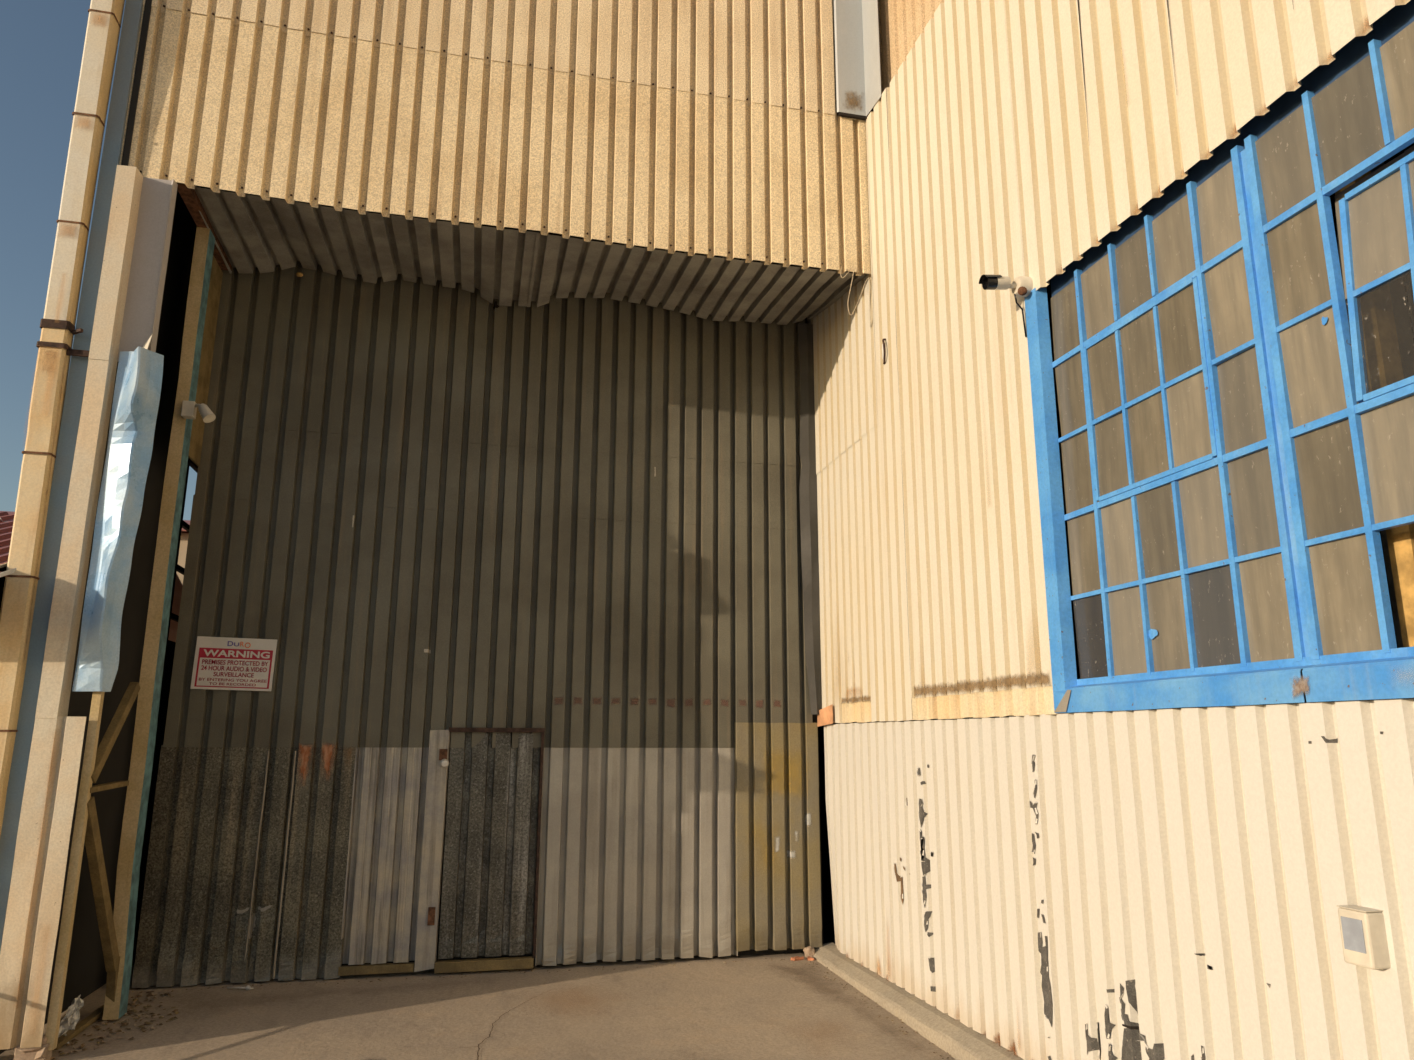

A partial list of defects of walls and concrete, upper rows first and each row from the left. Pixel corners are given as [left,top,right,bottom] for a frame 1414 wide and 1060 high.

damp [914,673,1049,696]
corrosion [299,744,334,779]
peeling [894,764,933,937]
peeling [1029,755,1039,866]
peeling [928,957,936,992]
peeling [1037,900,1052,1038]
crack [444,991,548,1060]
peeling [1085,979,1165,1060]